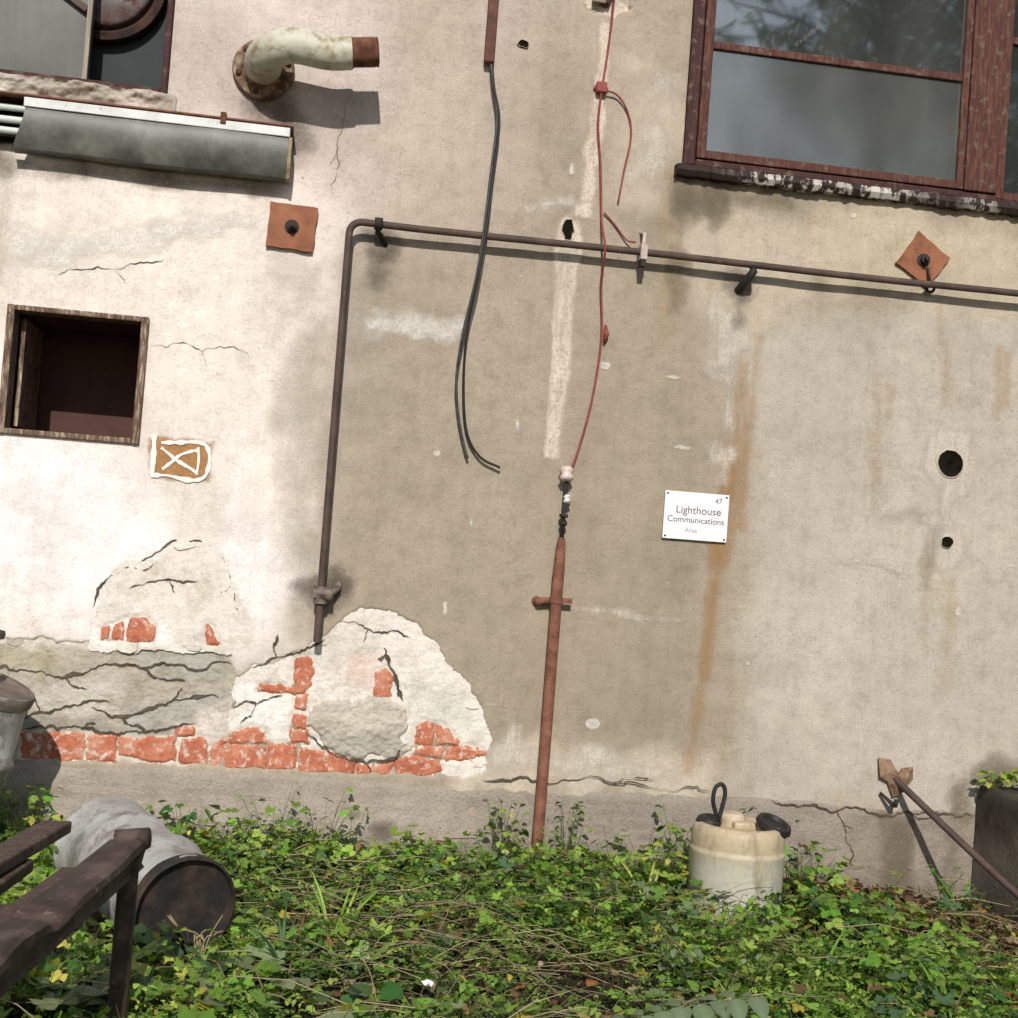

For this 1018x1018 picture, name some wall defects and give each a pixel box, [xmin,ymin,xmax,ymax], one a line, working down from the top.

flaking render [584,0,629,18]
crack [0,635,325,735]
flaking render [0,538,492,778]
crack [345,621,408,700]
crack [482,775,710,792]
crack [772,800,973,864]